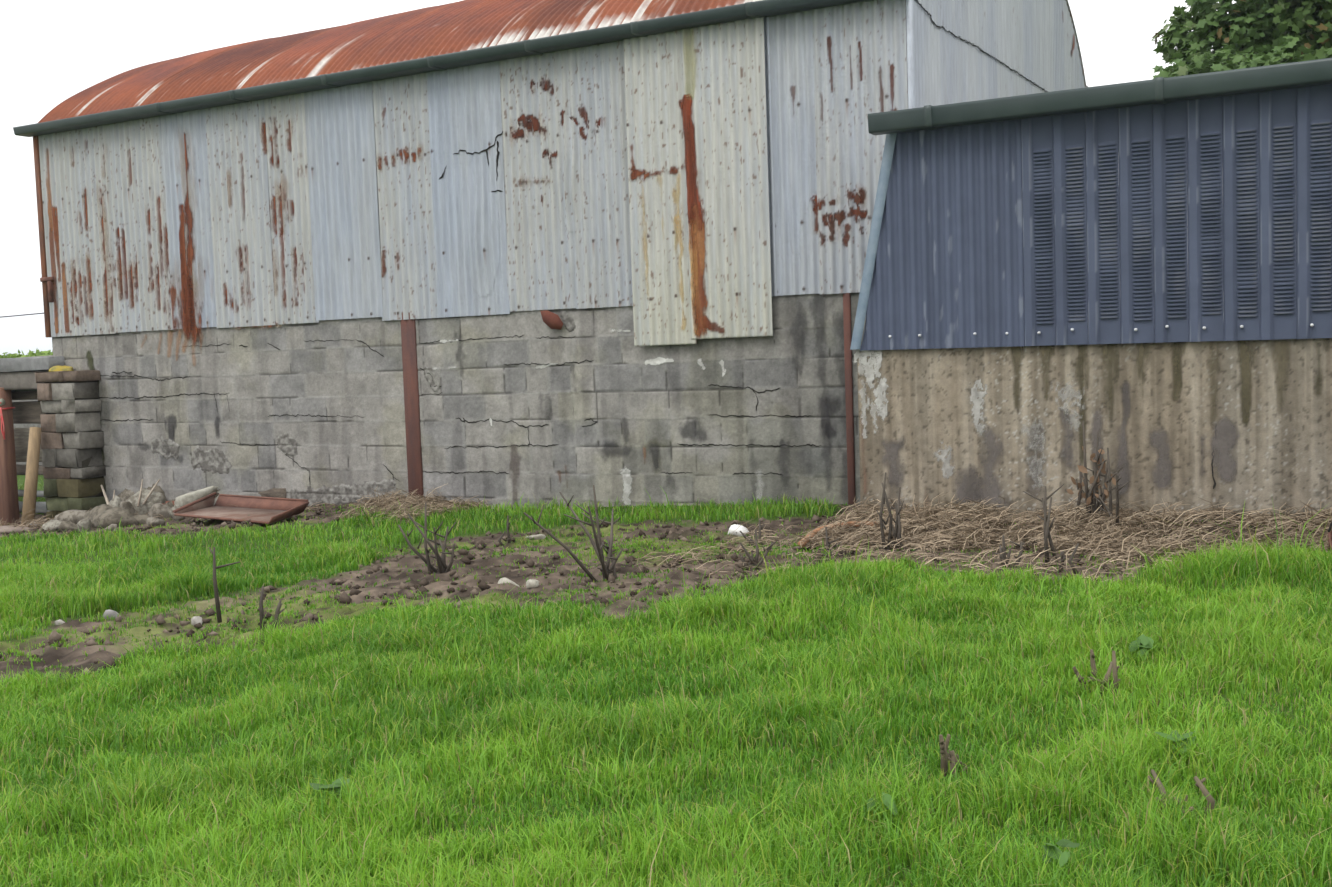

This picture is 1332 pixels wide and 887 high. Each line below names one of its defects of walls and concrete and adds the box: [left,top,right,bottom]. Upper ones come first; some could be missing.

rust [263,120,291,166]
rust [378,148,421,169]
rust [47,133,201,359]
rust [224,245,276,328]
rust [269,185,305,307]
rust [631,94,724,337]
water stain [1011,346,1023,408]
water stain [1040,345,1053,399]
water stain [1061,343,1146,494]
water stain [1150,431,1171,488]
water stain [1172,342,1182,400]
water stain [1202,340,1251,481]